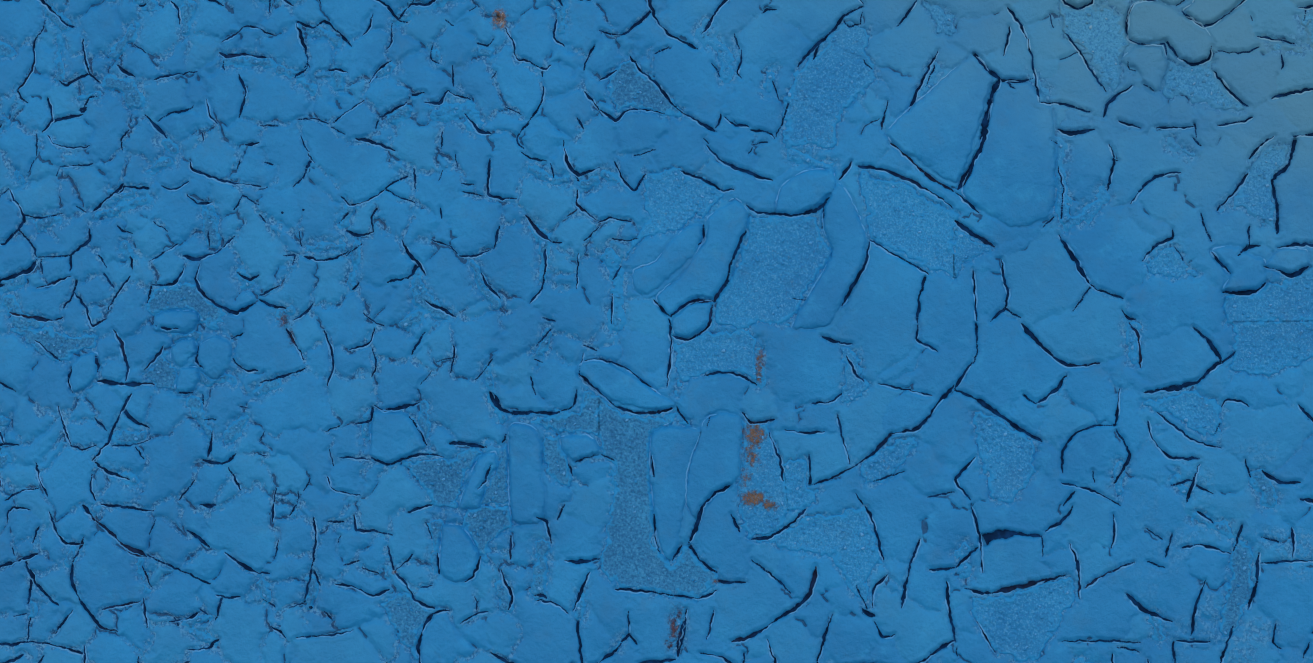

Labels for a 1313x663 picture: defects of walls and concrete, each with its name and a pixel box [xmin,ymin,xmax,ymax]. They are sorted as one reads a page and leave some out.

rust [493,11,506,28]
peeling [763,21,876,149]
crack [438,0,1295,485]
crack [1200,133,1313,297]
crack [0,0,501,663]
peeling [361,409,427,463]
peeling [427,519,479,583]
crack [186,345,819,663]
peeling [459,167,883,602]
rust [742,425,777,509]
peeling [971,577,1075,663]
crack [856,388,1313,663]